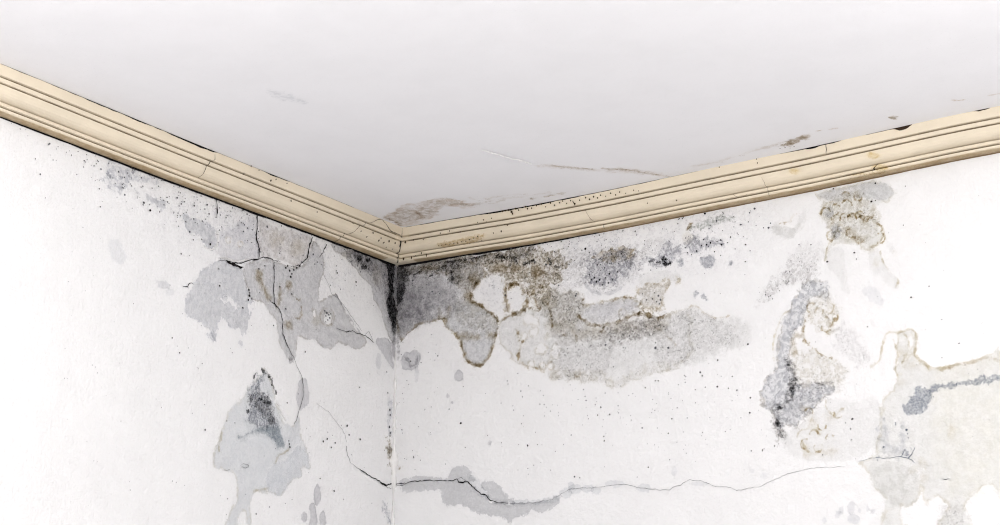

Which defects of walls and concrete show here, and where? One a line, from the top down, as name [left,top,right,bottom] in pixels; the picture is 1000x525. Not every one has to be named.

damp [115,169,268,252]
damp [285,235,630,334]
crack [0,64,1000,424]